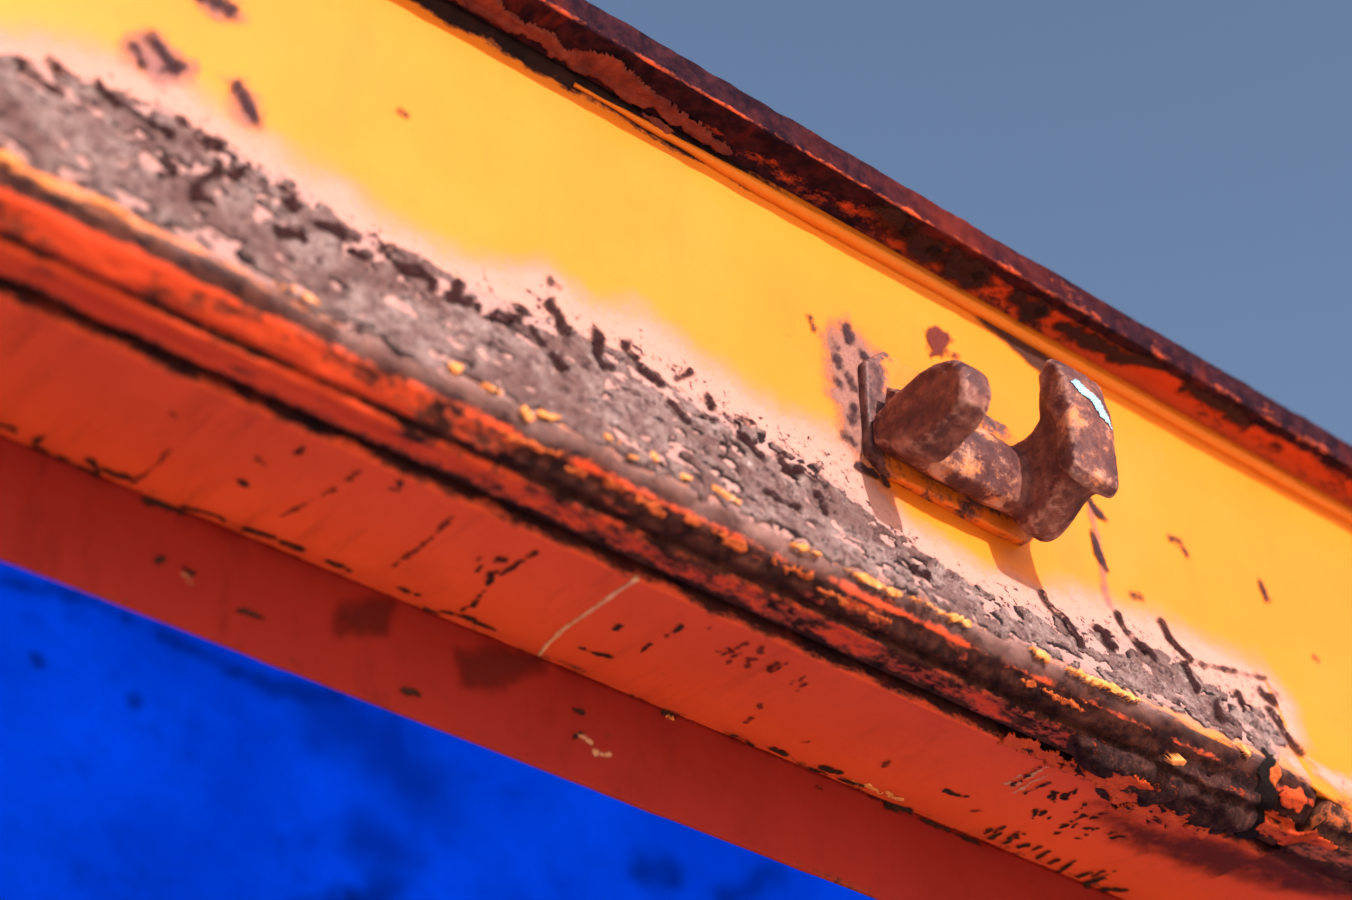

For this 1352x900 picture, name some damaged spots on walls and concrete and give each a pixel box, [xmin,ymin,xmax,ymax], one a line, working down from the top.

rust [198,0,242,20]
peeling [456,0,733,156]
rust [0,31,1306,762]
peeling [501,405,587,477]
peeling [602,476,667,519]
peeling [683,512,747,553]
peeling [397,551,539,631]
peeling [772,542,986,631]
peeling [1028,646,1051,665]
peeling [1020,666,1141,712]
peeling [725,732,1129,893]
peeling [1255,762,1338,850]